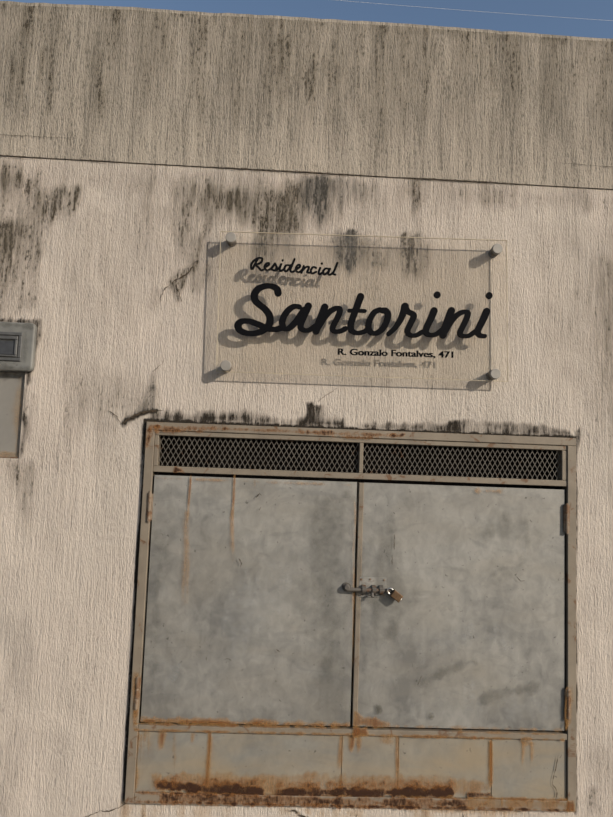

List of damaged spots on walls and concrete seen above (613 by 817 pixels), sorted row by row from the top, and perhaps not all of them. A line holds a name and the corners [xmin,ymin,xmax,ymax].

water stain [10,6,51,89]
water stain [267,19,291,92]
water stain [302,54,318,101]
water stain [0,165,79,308]
crack [160,260,197,303]
water stain [170,175,348,299]
water stain [332,223,382,275]
water stain [400,231,428,279]
corrosion [134,710,574,812]
crack [286,806,318,817]